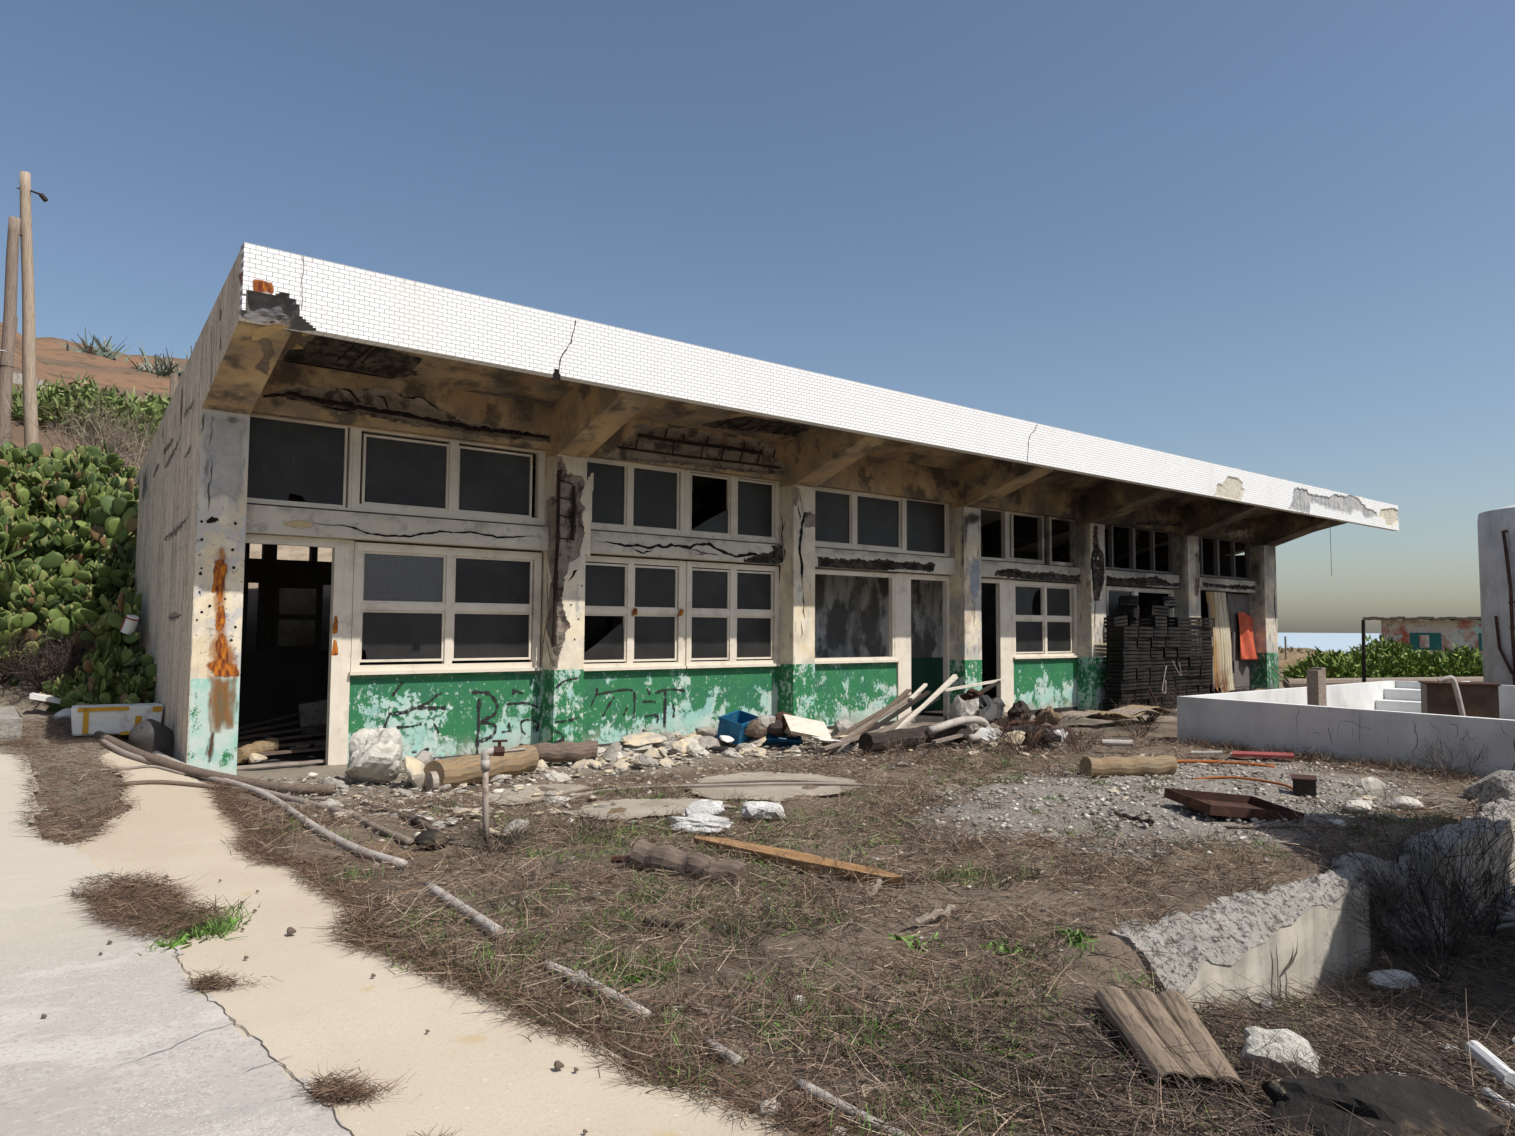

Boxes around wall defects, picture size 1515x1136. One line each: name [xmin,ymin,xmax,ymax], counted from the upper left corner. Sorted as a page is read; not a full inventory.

crack [559,320,576,370]
crack [263,388,548,437]
spalling [241,289,585,672]
peeling [1213,476,1245,501]
peeling [1288,487,1398,528]
crack [317,523,551,667]
crack [597,495,806,649]
spalling [970,525,1256,601]
corrosion [206,548,239,762]
peeling [588,706,699,744]